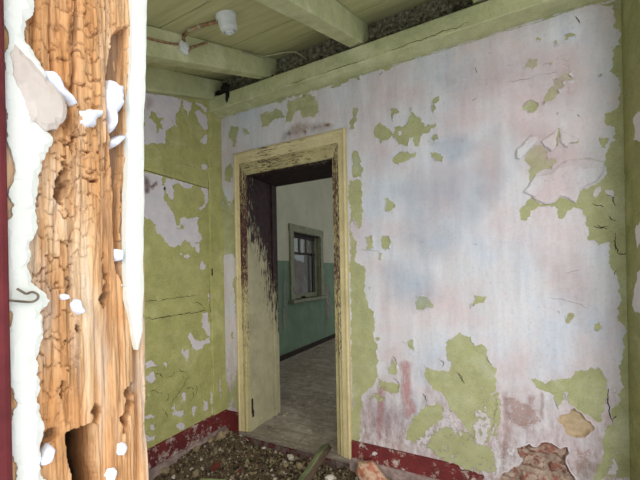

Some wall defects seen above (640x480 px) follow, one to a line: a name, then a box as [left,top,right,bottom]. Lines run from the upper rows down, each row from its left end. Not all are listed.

crack [388,22,468,51]
peeling [143,93,208,146]
peeling [144,173,209,259]
peeling [221,0,640,480]
crack [593,195,626,255]
crack [145,286,212,352]
peeling [180,311,211,364]
peeling [145,360,167,385]
peeling [171,371,238,430]